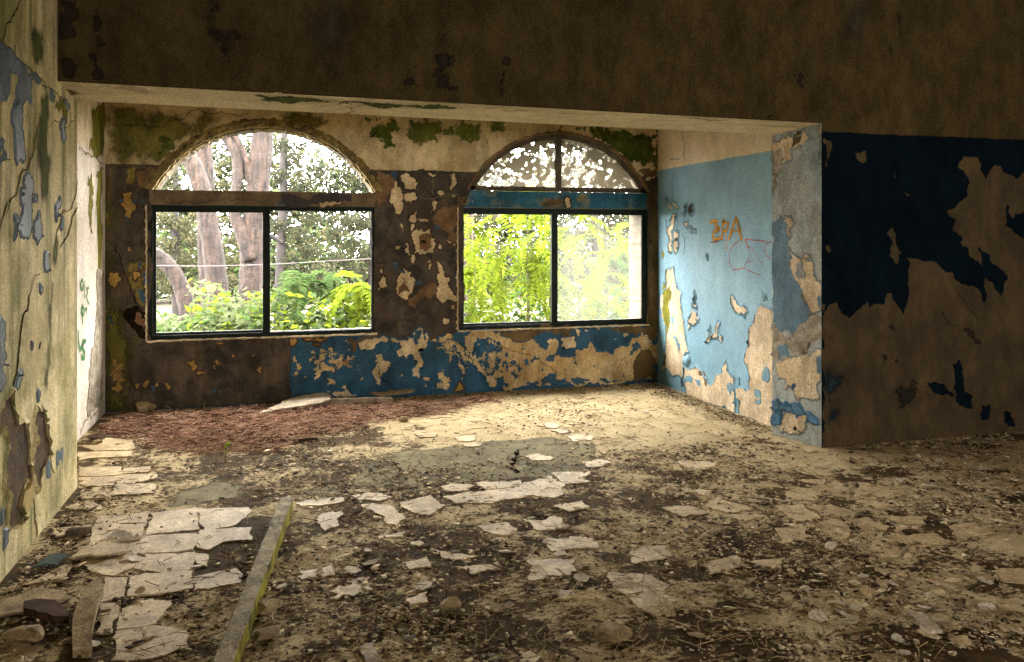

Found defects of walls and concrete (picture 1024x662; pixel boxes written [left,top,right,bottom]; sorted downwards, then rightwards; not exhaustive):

crack [0,0,104,229]
crack [56,180,78,248]
peeling [119,167,144,221]
peeling [770,123,834,195]
crack [14,272,40,423]
peeling [87,247,173,417]
peeling [288,154,1024,448]
flaking render [0,374,54,551]